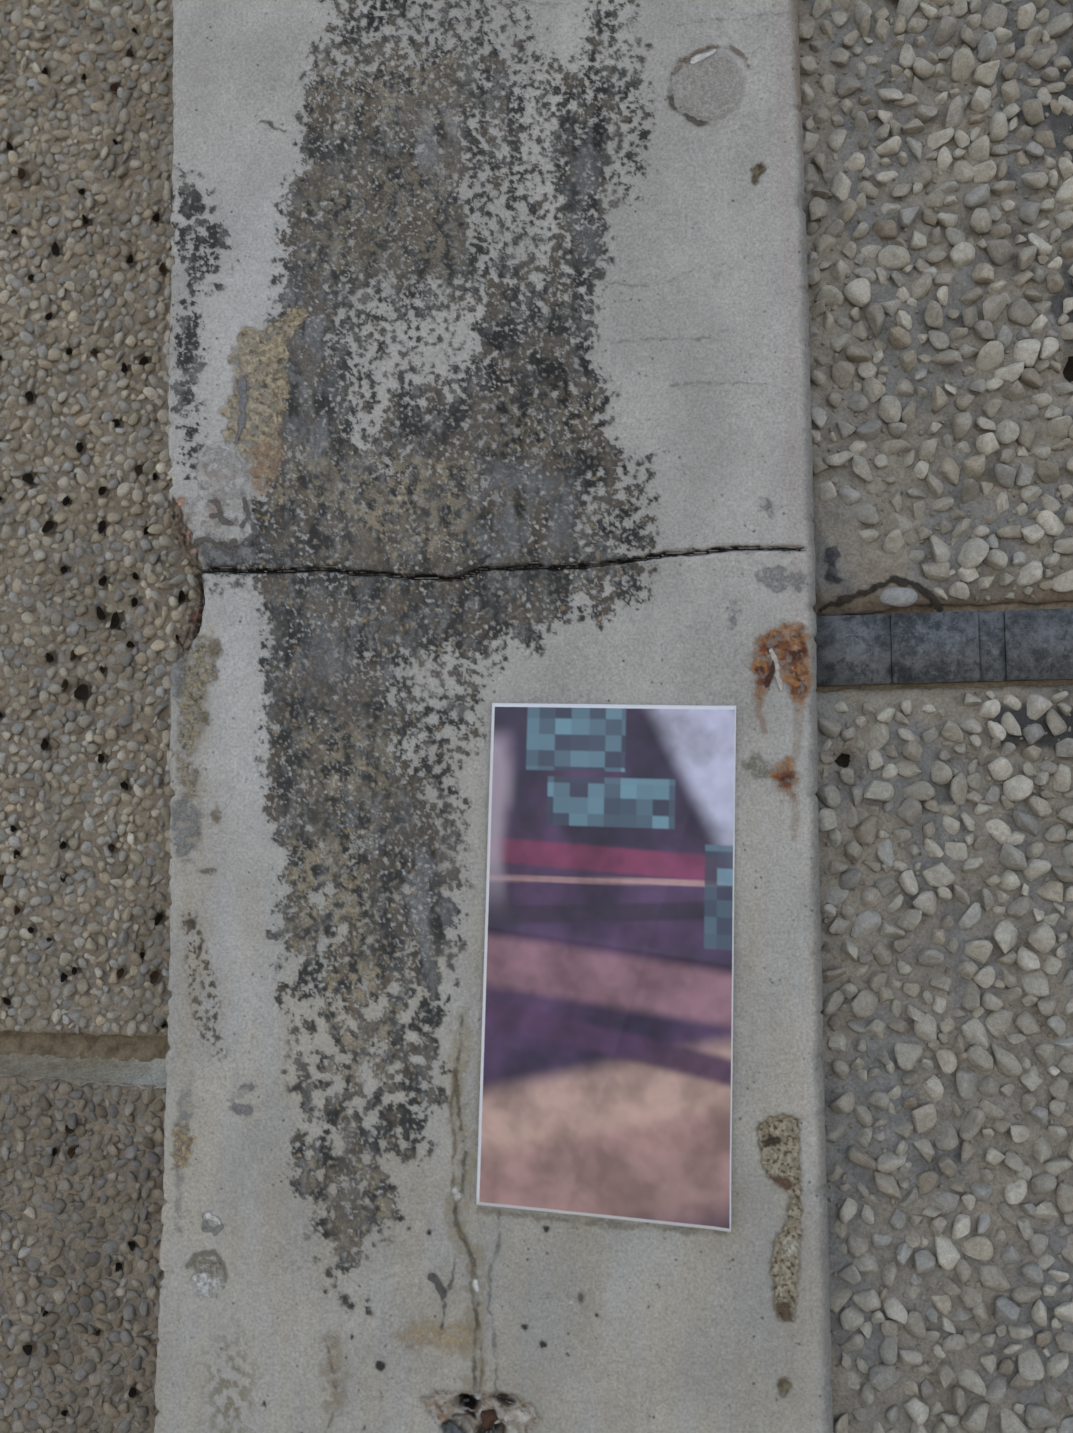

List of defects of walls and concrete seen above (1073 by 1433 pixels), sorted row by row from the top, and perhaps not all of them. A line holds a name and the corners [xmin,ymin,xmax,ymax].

mould [167,170,232,480]
peeling [219,307,308,494]
water stain [191,0,659,1316]
crack [199,545,943,632]
rust [751,622,813,728]
rust [745,756,799,798]
water stain [183,912,222,1055]
crack [428,1015,500,1396]
spalling [757,1113,803,1322]
spalling [420,1391,542,1433]